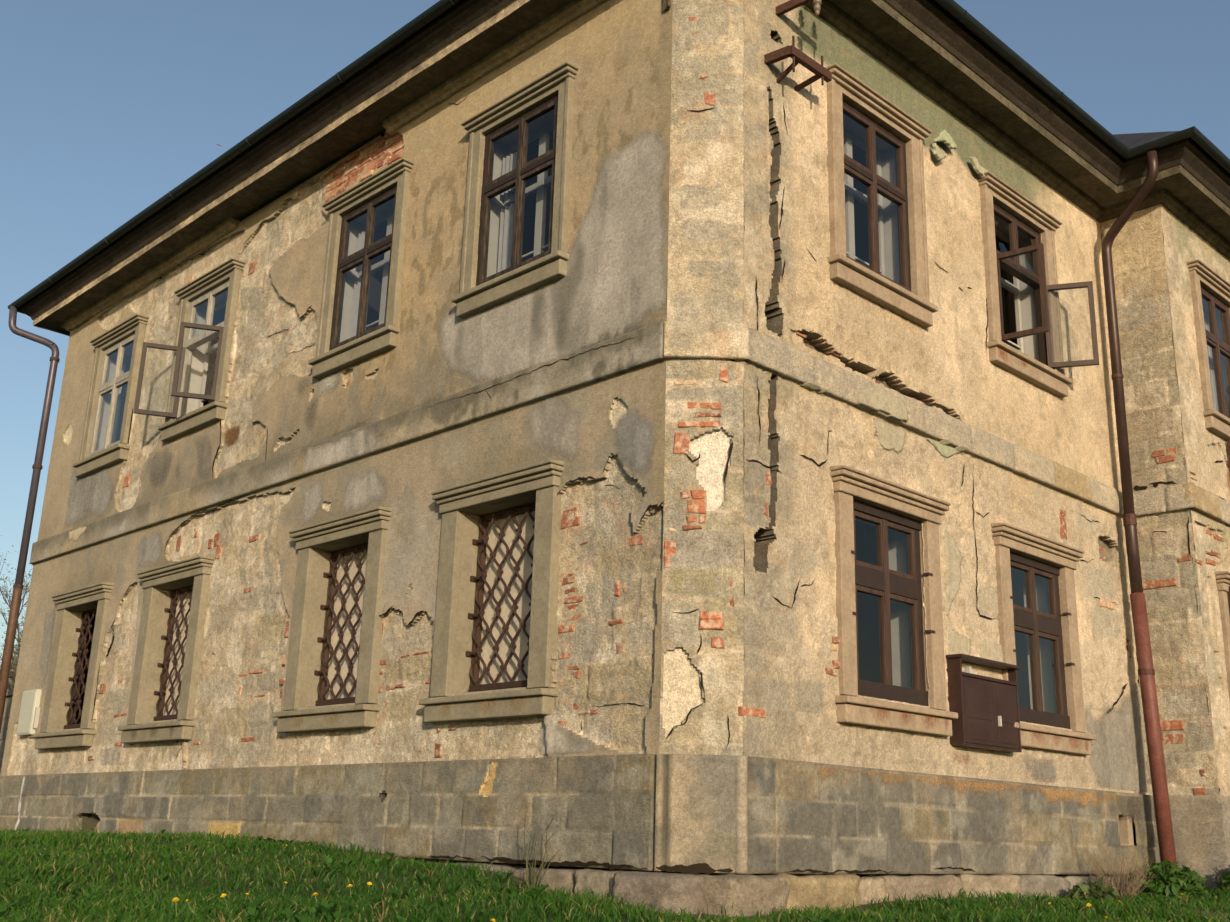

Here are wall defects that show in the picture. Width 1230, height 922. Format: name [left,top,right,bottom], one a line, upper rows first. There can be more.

flaking render [699,75,716,106]
crack [755,86,816,338]
peeling [96,131,404,512]
spalling [609,397,628,429]
flaking render [673,402,721,455]
crack [685,374,831,527]
peeling [858,380,926,454]
peeling [6,452,707,776]
flaking render [699,578,735,649]